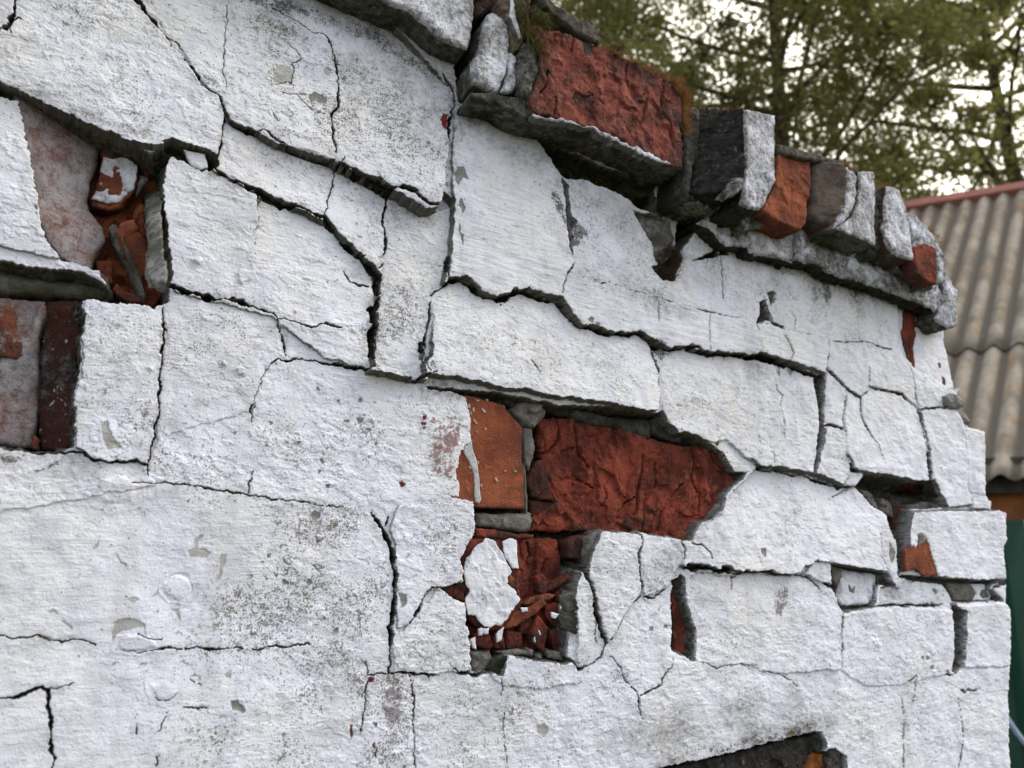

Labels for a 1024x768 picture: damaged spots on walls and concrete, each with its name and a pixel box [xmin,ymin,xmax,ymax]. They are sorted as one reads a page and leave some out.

spalling [183,149,208,172]
spalling [0,96,168,452]
crack [30,40,430,508]
crack [412,256,949,430]
spalling [900,309,916,367]
crack [362,516,503,720]
spalling [440,395,736,674]
crack [572,572,666,711]
crack [682,544,829,587]
crack [751,459,856,493]
spalling [889,534,938,576]
crack [1,686,57,758]